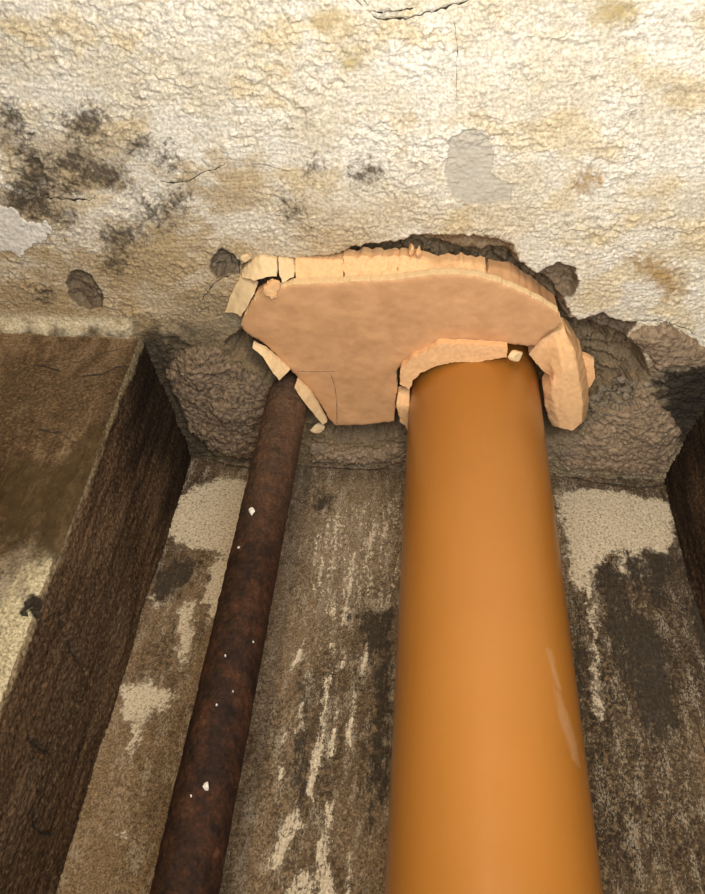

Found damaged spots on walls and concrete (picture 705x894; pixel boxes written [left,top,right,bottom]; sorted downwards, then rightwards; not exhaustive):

crack [356,0,468,97]
leakage [62,107,106,140]
leakage [5,131,149,225]
spalling [66,270,104,310]
spalling [210,248,251,278]
spalling [536,262,579,297]
spalling [580,312,637,336]
peeling [508,350,523,362]
peeling [310,423,325,433]
leakage [147,476,247,672]
leakage [553,488,705,754]
leakage [307,490,401,834]